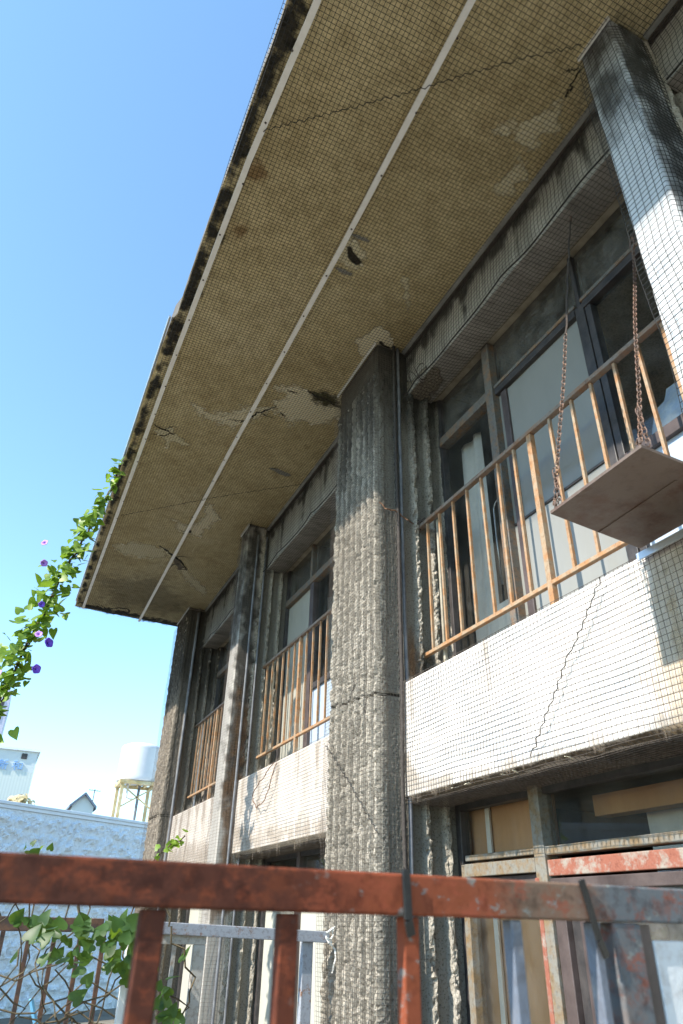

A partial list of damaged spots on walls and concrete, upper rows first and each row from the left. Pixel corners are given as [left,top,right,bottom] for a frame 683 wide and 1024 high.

crack [564,68,582,97]
efflorescence [492,99,562,149]
spalling [335,233,369,276]
peeling [192,384,342,428]
leakage [77,195,537,794]
crack [159,545,187,570]
crack [330,680,399,721]